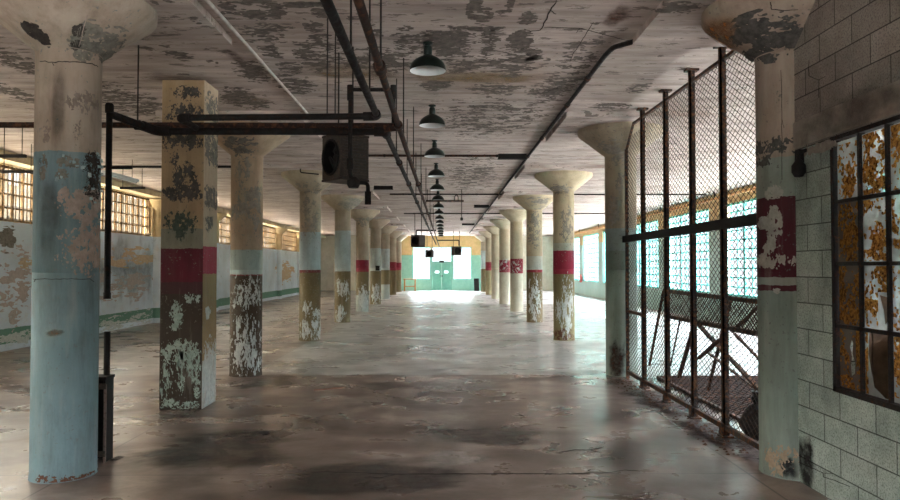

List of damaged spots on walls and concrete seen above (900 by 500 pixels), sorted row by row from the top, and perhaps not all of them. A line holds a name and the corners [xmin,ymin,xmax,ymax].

crack [524,0,628,61]
peeling [729,9,804,65]
peeling [588,103,632,111]
peeling [626,83,653,93]
peeling [39,0,611,340]
peeling [757,184,797,269]
peeling [0,216,32,347]
peeling [160,292,216,409]
peeling [230,275,262,376]
damp [780,442,813,487]